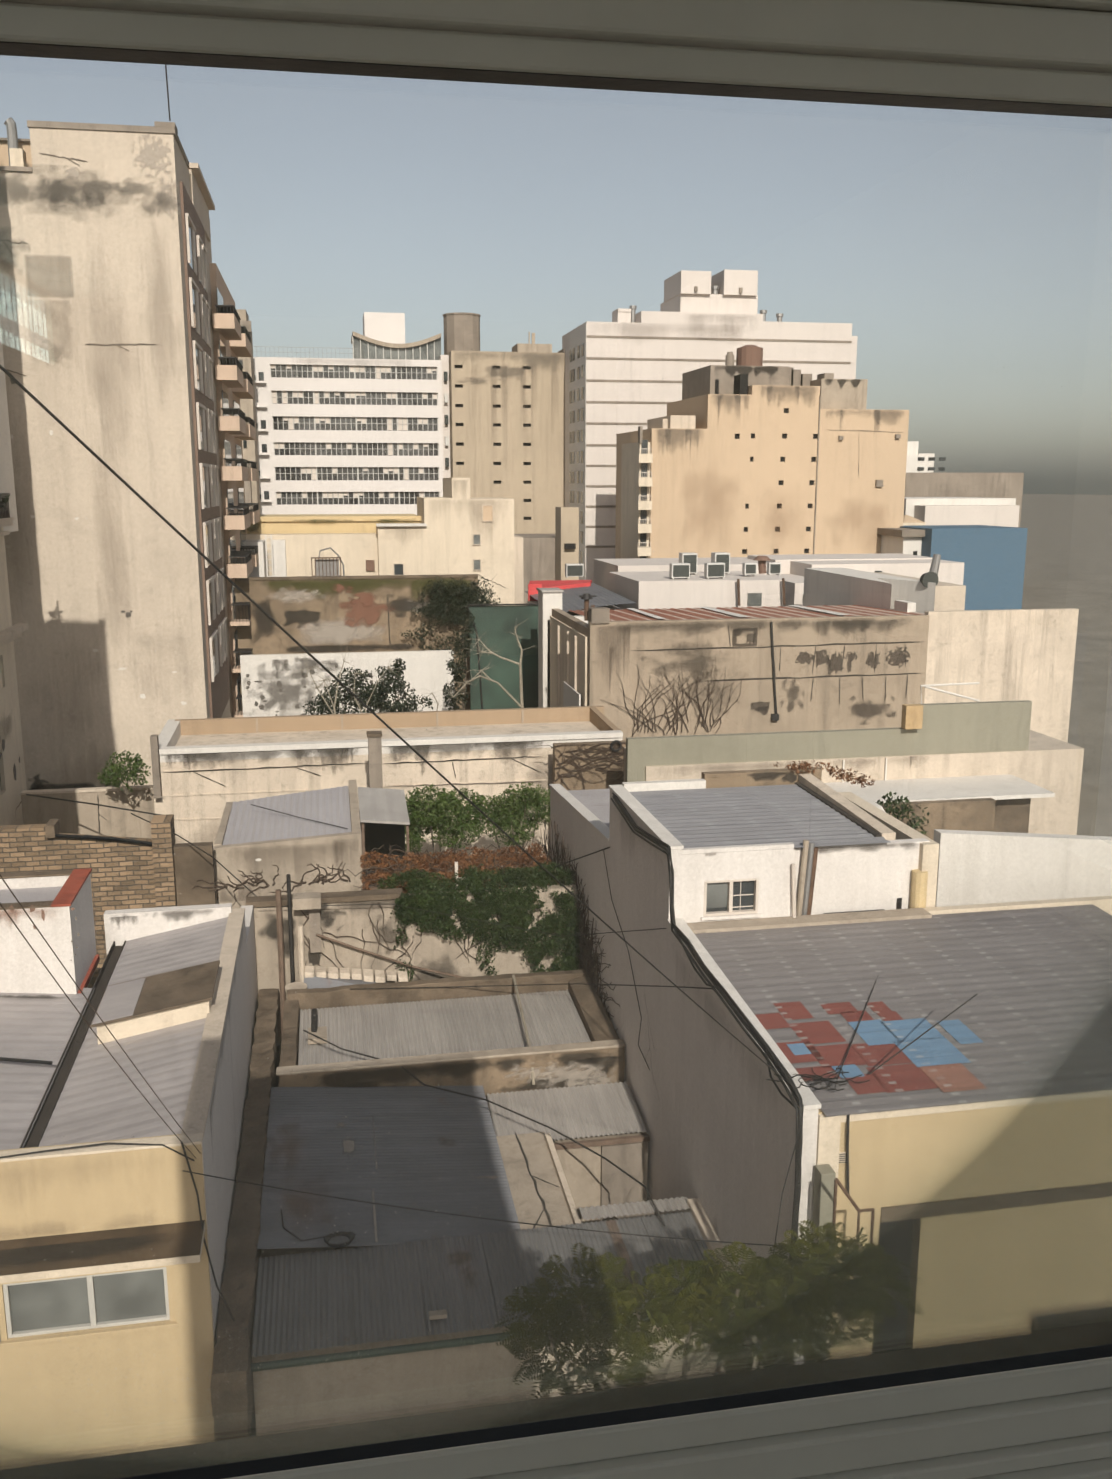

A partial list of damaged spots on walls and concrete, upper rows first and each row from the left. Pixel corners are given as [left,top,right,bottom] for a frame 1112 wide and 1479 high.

water stain [253,582,364,638]
water stain [389,580,471,617]
water stain [781,620,892,631]
water stain [632,622,763,675]
water stain [265,644,413,709]
water stain [751,702,769,715]
water stain [788,686,802,710]
water stain [852,703,895,724]